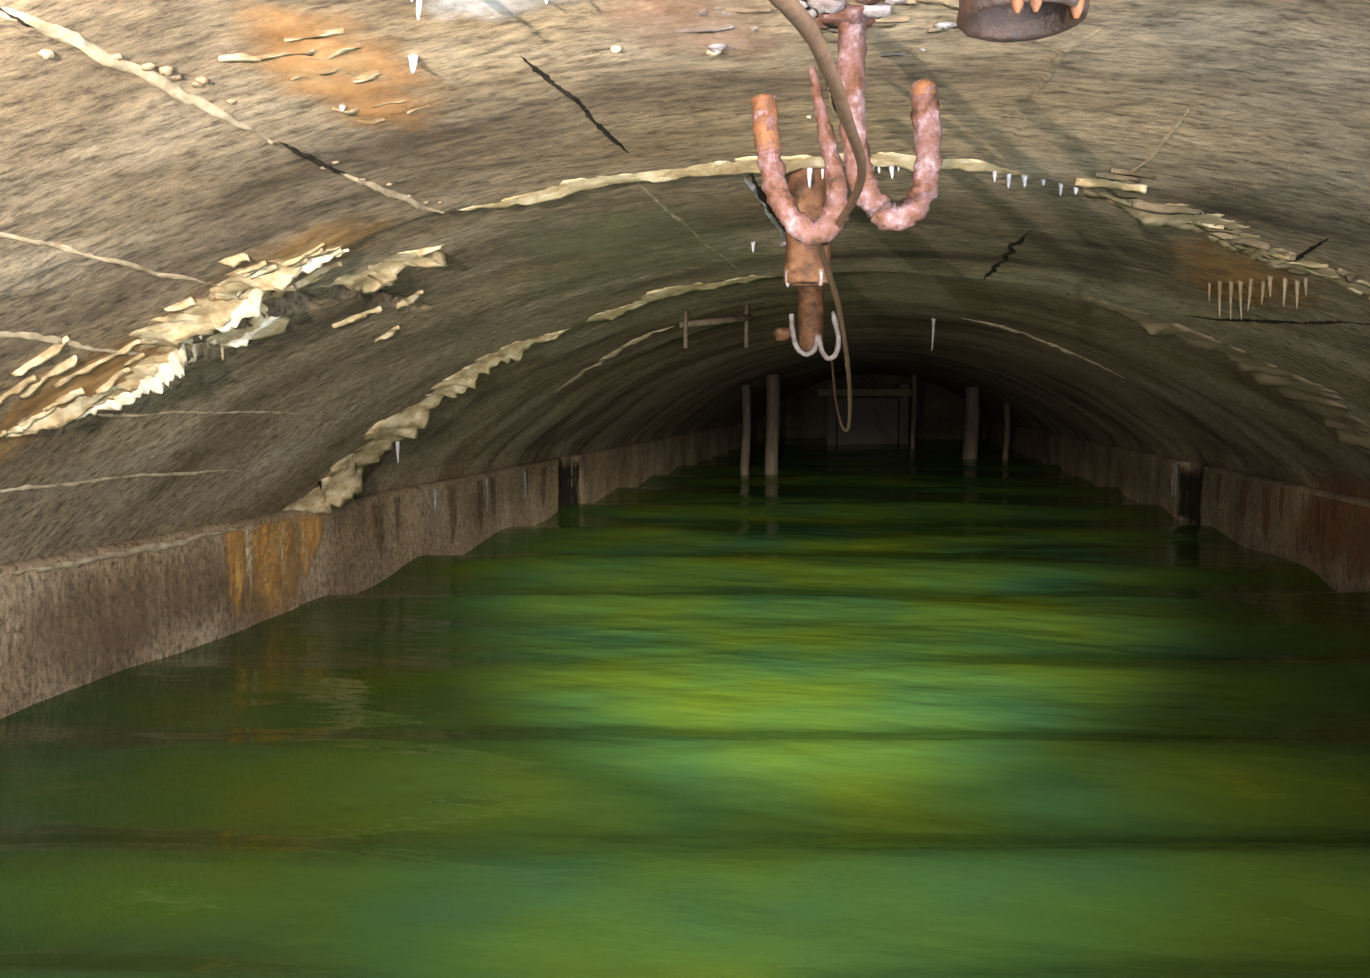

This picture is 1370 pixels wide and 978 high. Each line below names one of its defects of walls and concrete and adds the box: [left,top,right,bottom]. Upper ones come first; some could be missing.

crack [0,232,219,287]
crack [0,6,446,214]
spalling [0,243,449,438]
crack [520,55,743,272]
corrosion [225,515,322,617]